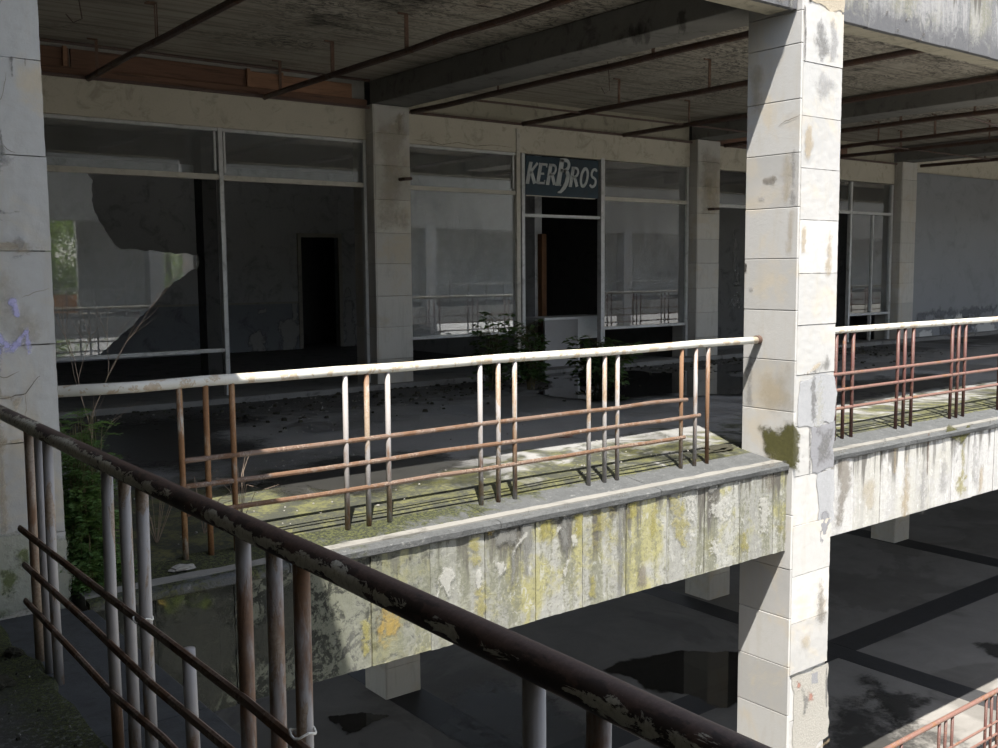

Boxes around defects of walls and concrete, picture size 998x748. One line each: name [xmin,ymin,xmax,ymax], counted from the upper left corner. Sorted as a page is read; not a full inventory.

crack [0,372,40,413]
peeling [711,489,731,522]
peeling [798,373,837,541]
damp [837,450,851,524]
peeling [0,534,32,616]
peeling [57,537,72,609]
peeling [437,567,455,597]
damp [495,513,533,582]
damp [153,591,238,713]
damp [254,616,268,670]
damp [283,584,294,653]
peeling [791,663,829,748]